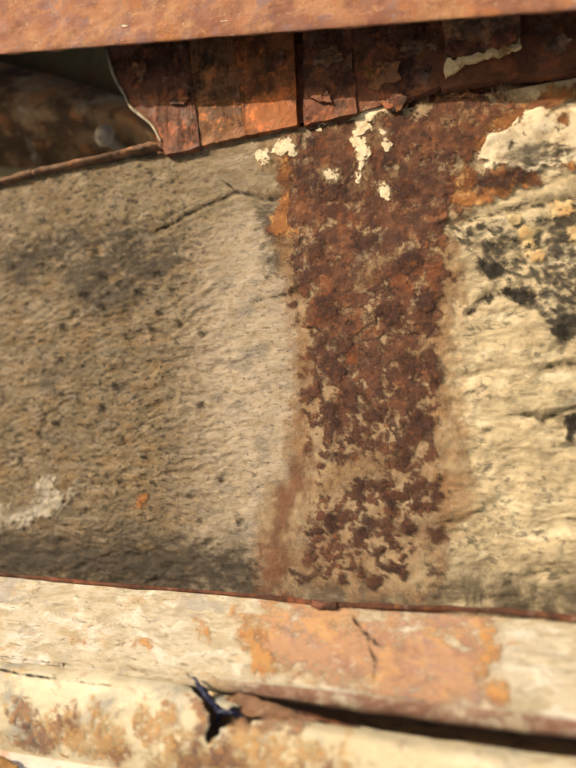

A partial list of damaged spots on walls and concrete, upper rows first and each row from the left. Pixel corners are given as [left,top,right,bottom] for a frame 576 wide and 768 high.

corrosion [442,15,521,79]
peeling [477,107,576,173]
crack [158,180,278,231]
peeling [507,214,546,263]
peeling [548,199,576,242]
spalling [475,260,502,281]
spalling [485,285,538,306]
damp [450,199,576,340]
corrosion [230,38,576,708]